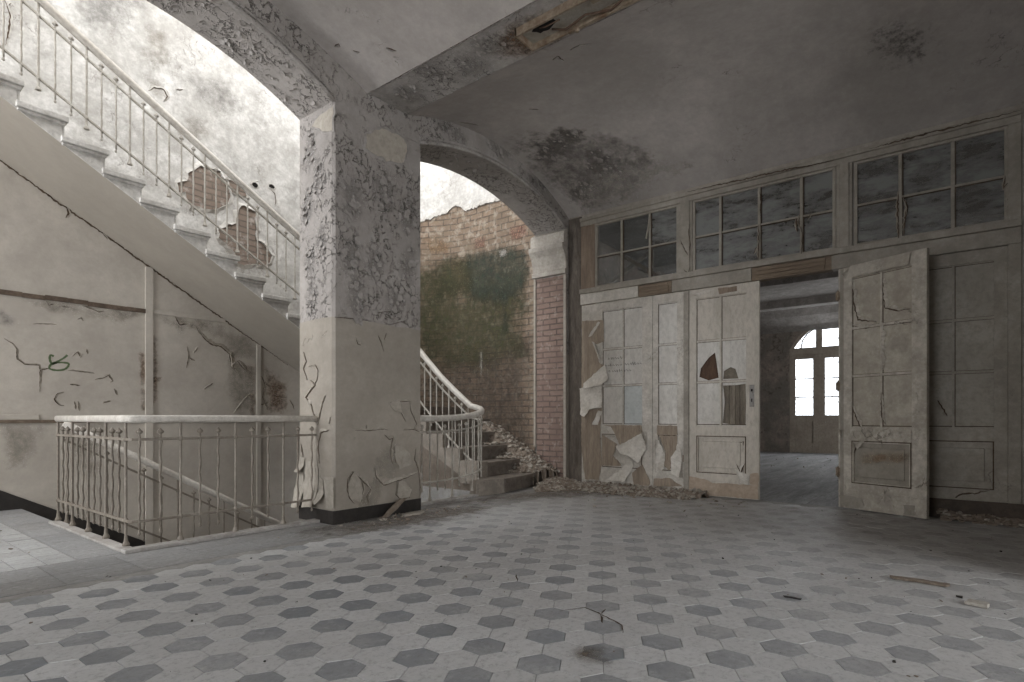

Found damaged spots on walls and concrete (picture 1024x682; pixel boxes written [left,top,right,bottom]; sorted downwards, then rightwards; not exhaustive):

spalling [174,161,277,270]
peeling [171,0,336,224]
leakage [533,131,667,207]
crack [0,160,331,464]
peeling [580,320,759,499]